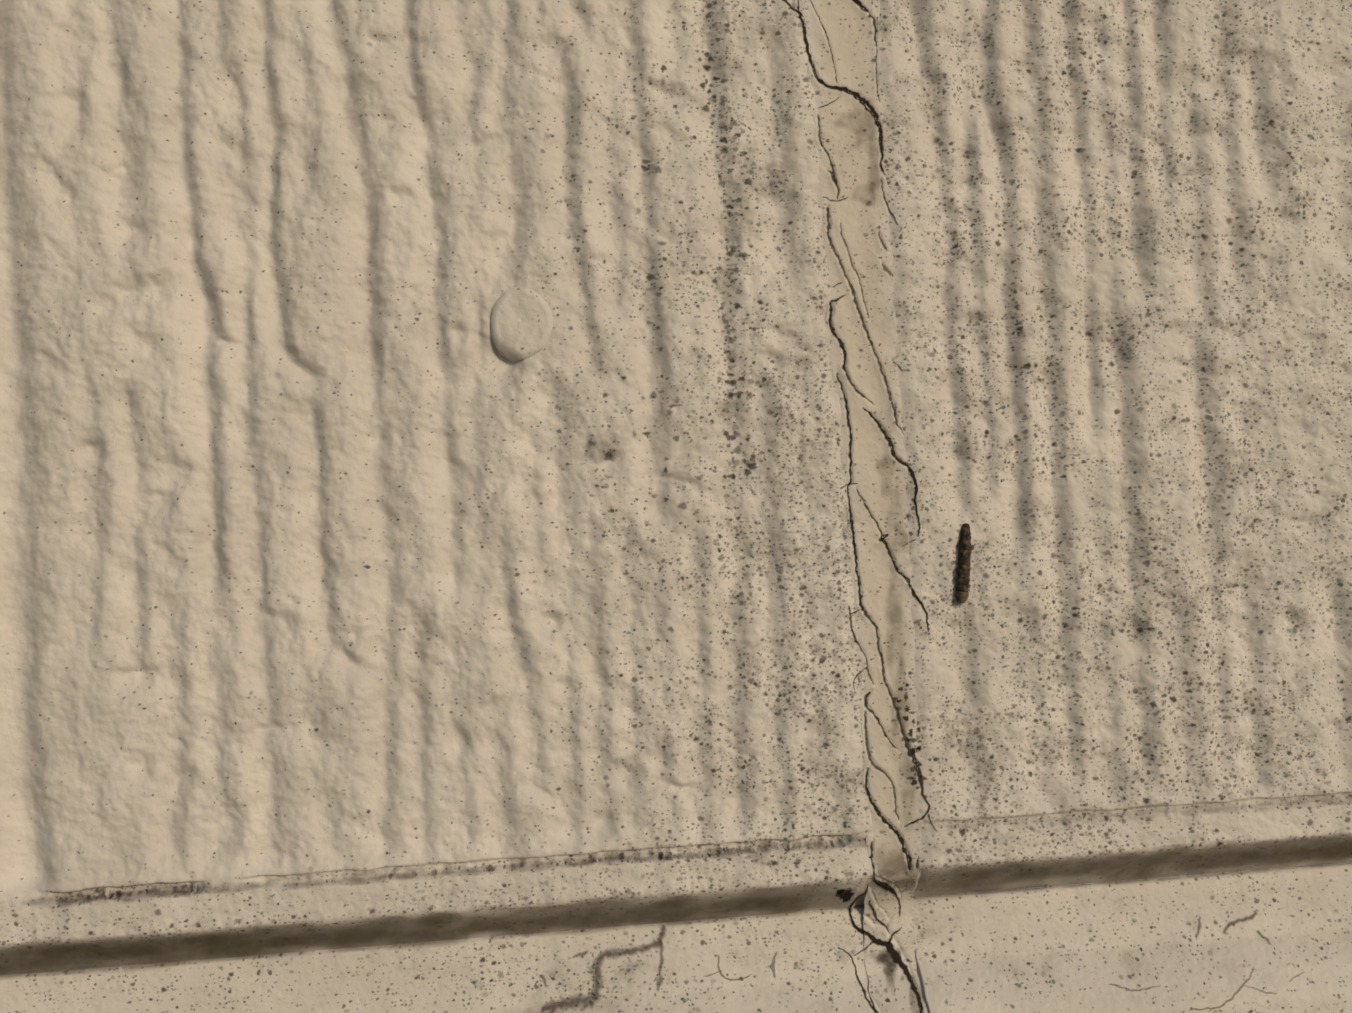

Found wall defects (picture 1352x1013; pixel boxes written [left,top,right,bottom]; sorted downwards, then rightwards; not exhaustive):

crack [542,926,665,1011]
crack [783,0,937,1013]